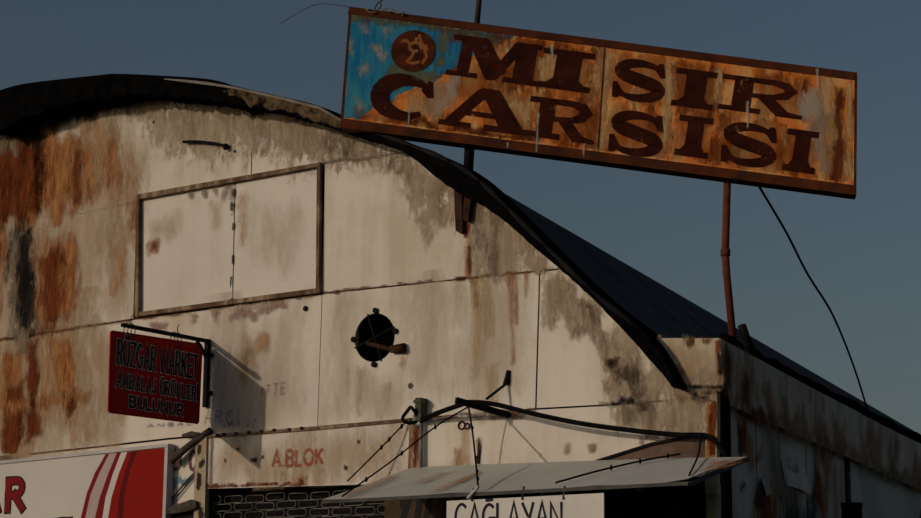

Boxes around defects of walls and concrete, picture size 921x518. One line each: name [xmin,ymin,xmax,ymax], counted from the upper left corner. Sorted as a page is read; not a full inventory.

rust [0,116,185,459]
leakage [0,100,455,459]
leakage [464,202,723,440]
rust [685,337,846,518]